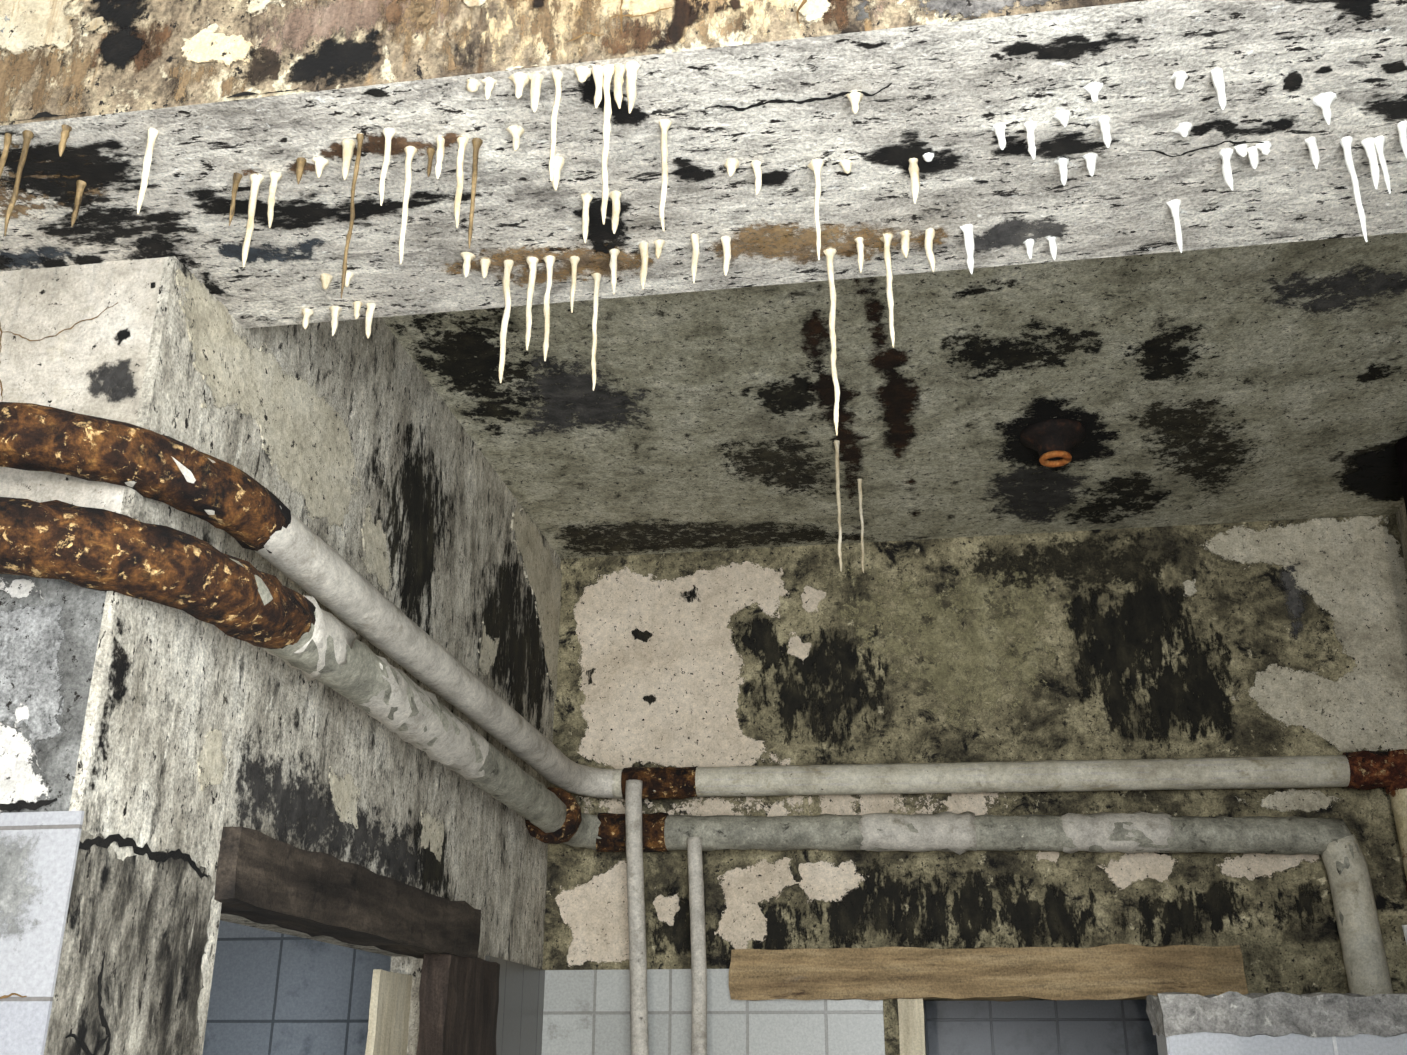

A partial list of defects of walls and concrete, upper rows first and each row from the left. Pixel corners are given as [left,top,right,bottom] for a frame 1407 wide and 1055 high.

flaking render [0,0,391,97]
leakage [0,44,482,297]
leakage [863,132,969,178]
leakage [391,307,659,438]
leakage [552,277,922,558]
crack [0,798,57,812]
flaking render [0,577,66,813]
crack [78,834,208,878]
peeling [511,492,826,769]
peeling [642,792,1015,949]
leakage [732,318,1265,764]
peeling [1201,438,1407,752]